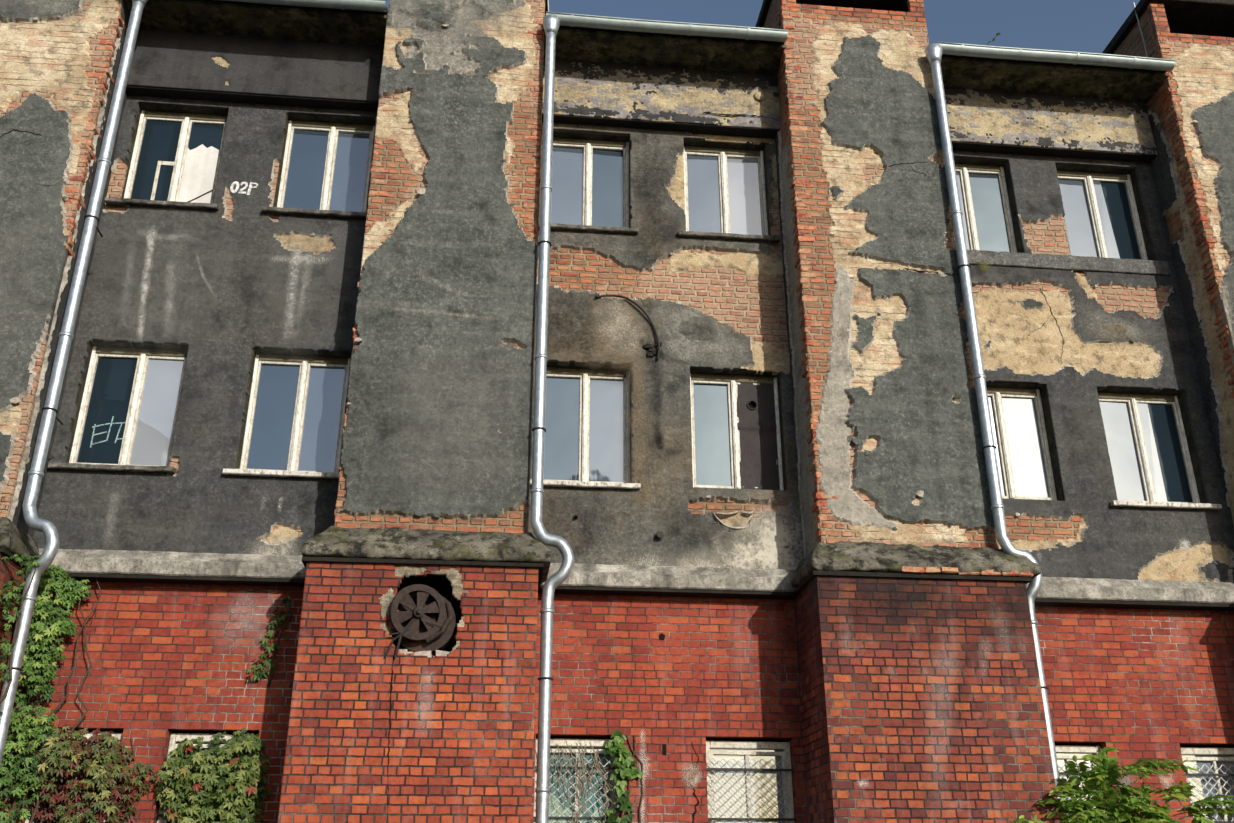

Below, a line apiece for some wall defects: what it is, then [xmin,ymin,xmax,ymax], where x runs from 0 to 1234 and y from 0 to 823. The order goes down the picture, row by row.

spalling [267,159,337,255]
spalling [0,0,130,521]
spalling [334,0,1234,558]
flaking render [901,566,1034,577]
spalling [1138,541,1234,583]